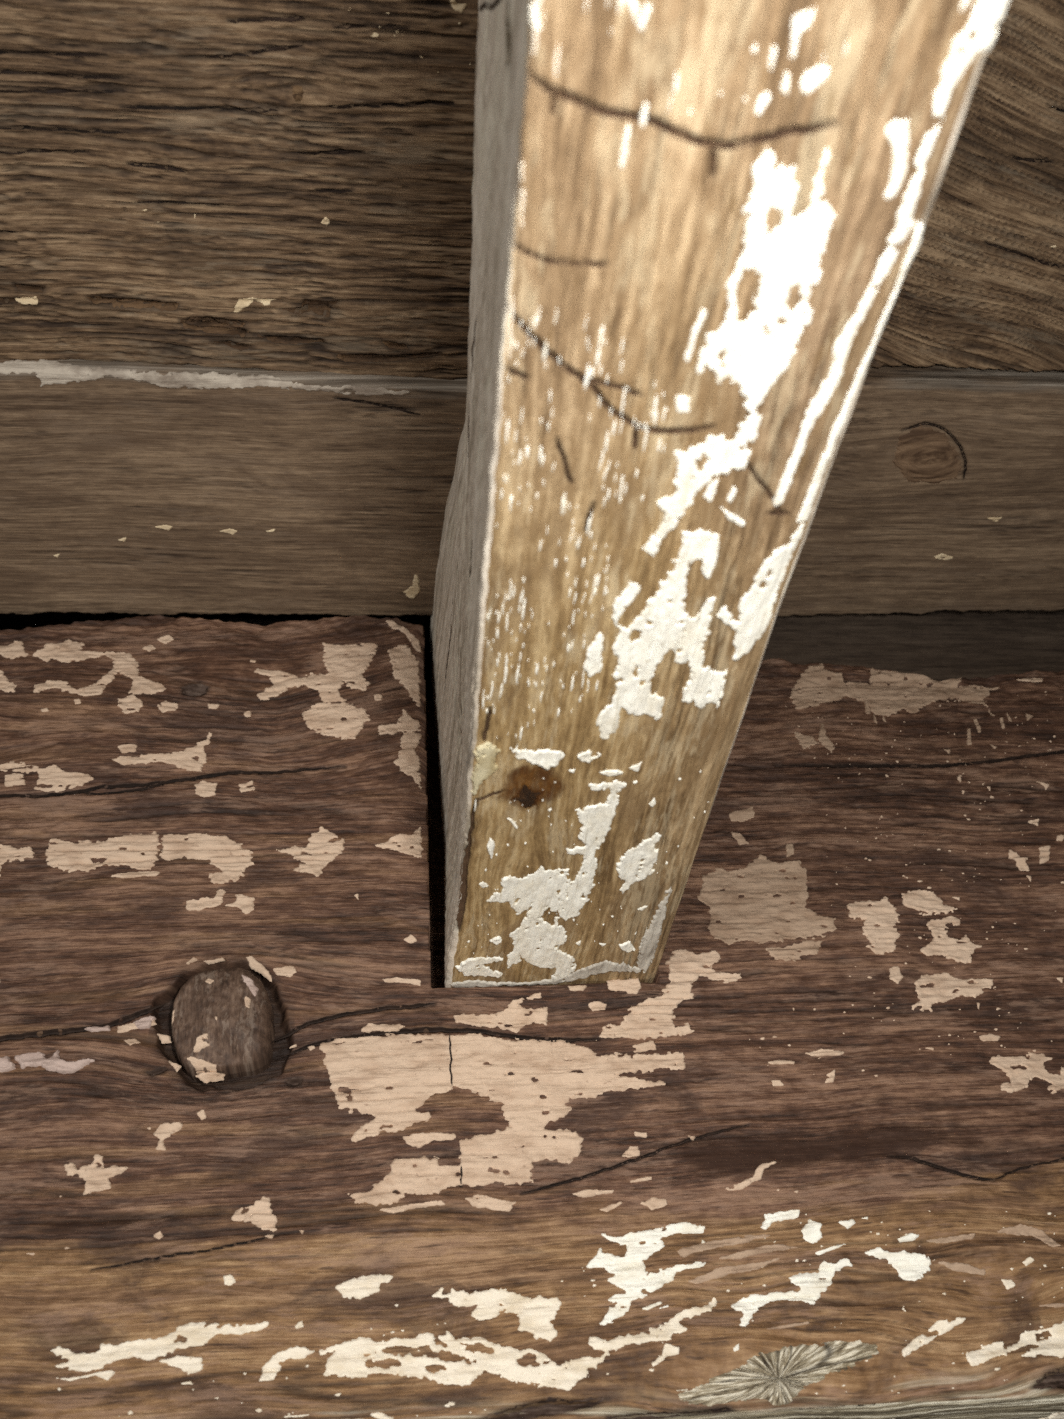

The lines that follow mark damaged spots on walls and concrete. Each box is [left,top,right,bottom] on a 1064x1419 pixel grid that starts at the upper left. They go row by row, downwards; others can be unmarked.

peeling [290,0,1033,1214]
peeling [0,634,178,714]
peeling [244,620,422,789]
peeling [112,732,218,797]
rust [499,766,562,807]
peeling [0,831,255,914]
crack [0,1003,166,1042]
peeling [979,1034,1064,1094]
crack [891,1155,1064,1180]
peeling [50,1321,269,1384]
peeling [243,1210,1034,1419]
peeling [966,1303,1064,1389]